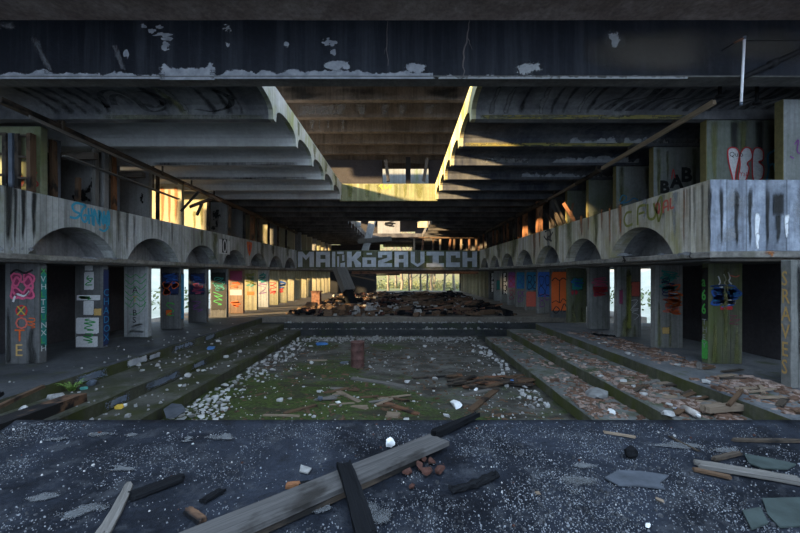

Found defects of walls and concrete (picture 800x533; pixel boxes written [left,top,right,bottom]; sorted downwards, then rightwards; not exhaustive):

peeling [141,24,173,51]
peeling [0,38,798,113]
crack [462,20,472,76]
leakage [5,184,36,241]
leakage [693,150,789,249]